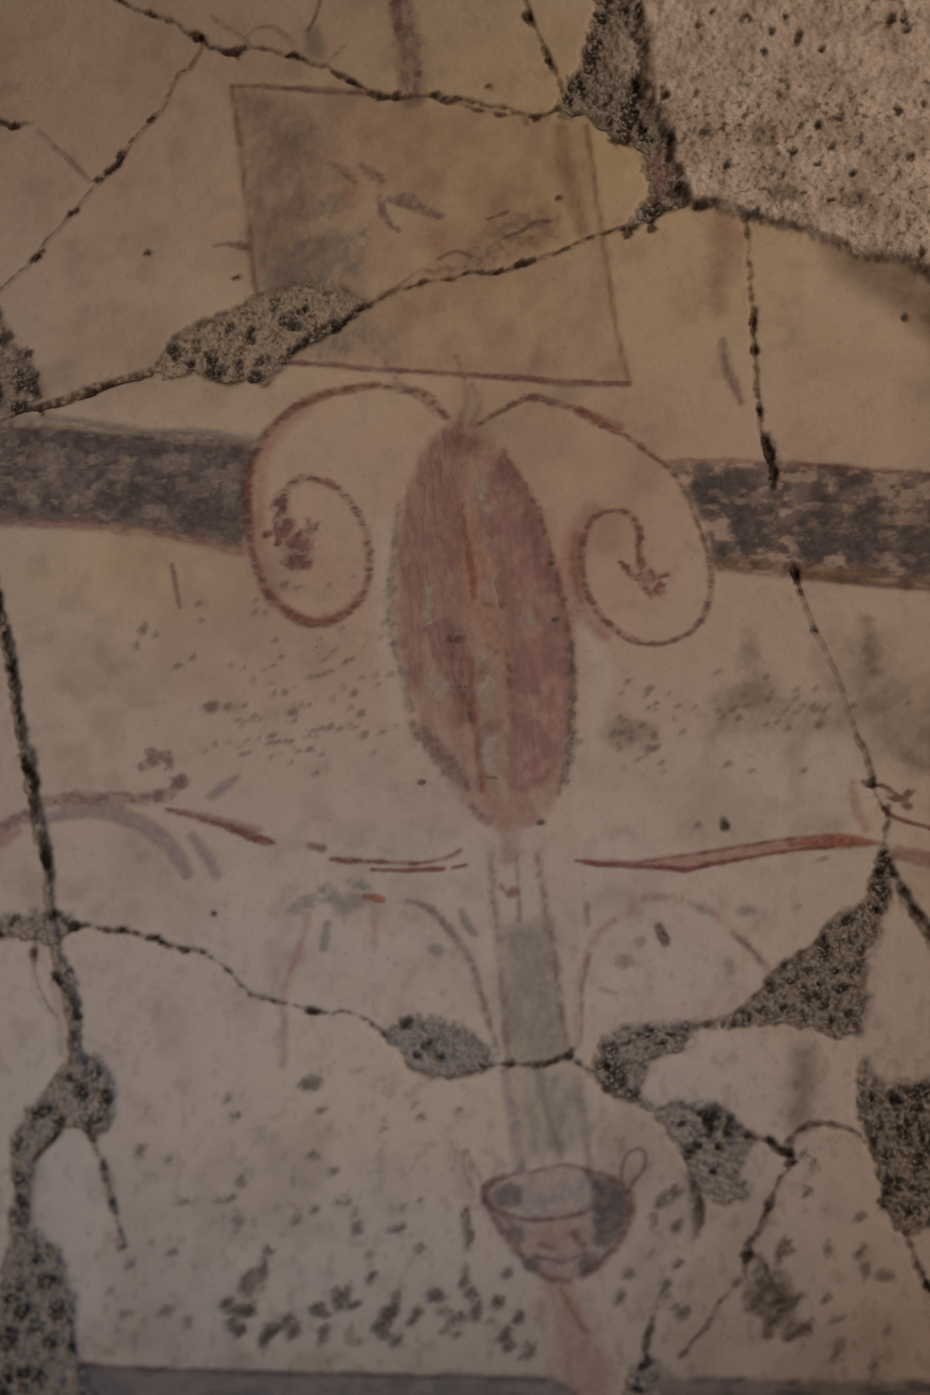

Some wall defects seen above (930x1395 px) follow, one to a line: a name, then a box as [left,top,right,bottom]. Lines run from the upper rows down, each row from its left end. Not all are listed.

crack [12,0,563,279]
spalling [556,0,805,230]
crack [2,371,153,420]
spalling [150,281,365,384]
crack [355,214,660,312]
crack [745,227,779,540]
crack [0,593,386,1079]
spalling [0,1055,114,1395]
spalling [386,1017,492,1079]
spalling [593,850,894,1231]
crack [643,1122,864,1360]
spalling [857,1062,930,1235]